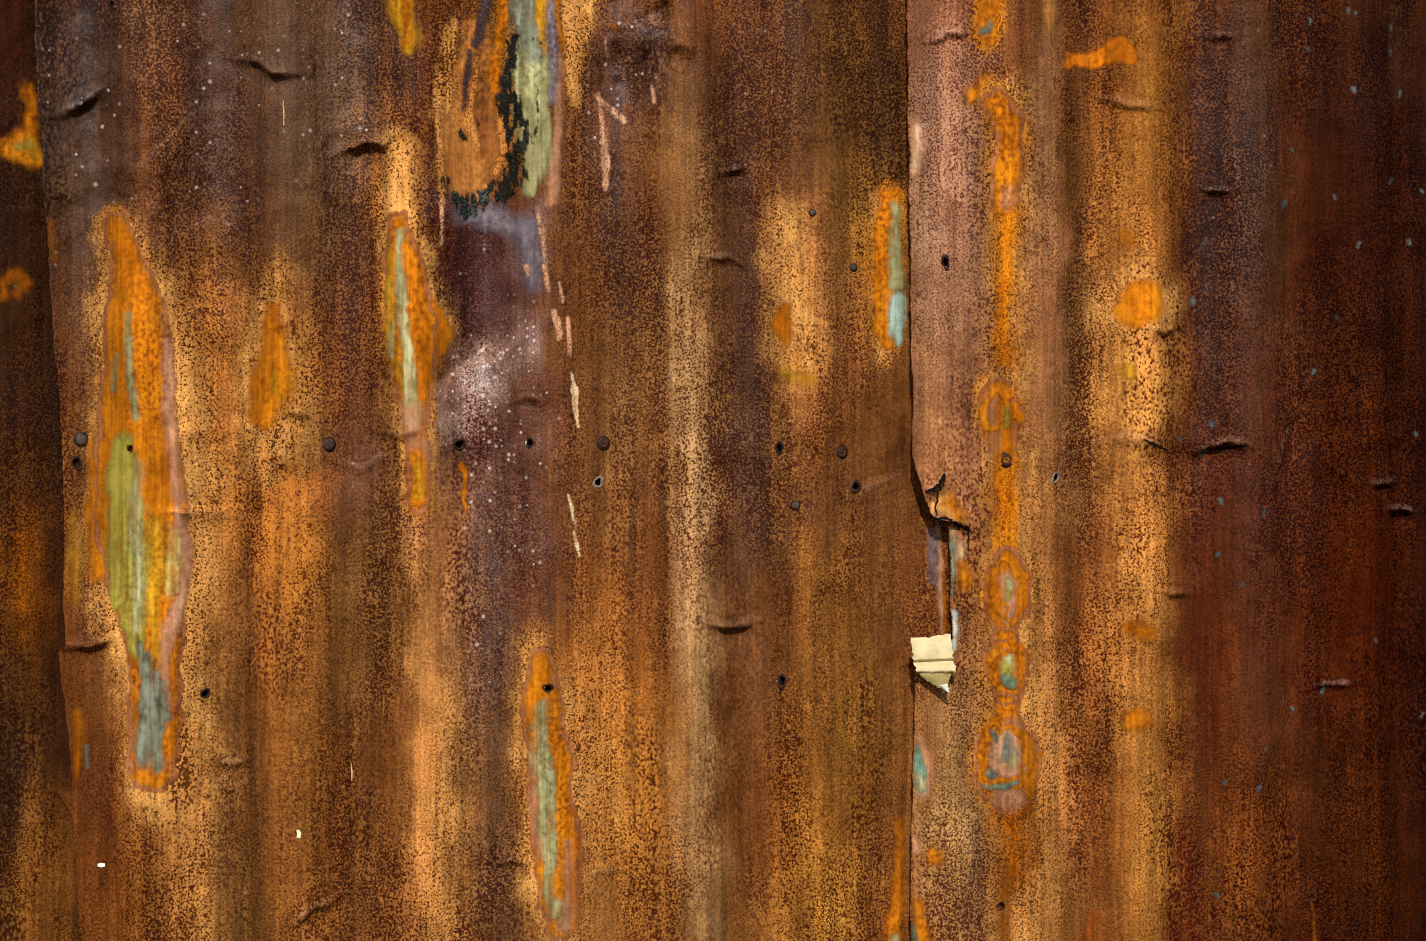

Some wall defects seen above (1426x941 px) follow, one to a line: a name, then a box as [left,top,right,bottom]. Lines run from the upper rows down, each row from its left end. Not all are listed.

rust [971,0,1007,55]
rust [1042,0,1056,34]
rust [1064,37,1137,69]
rust [911,123,925,175]
rust [235,258,322,489]
rust [373,126,457,518]
rust [864,180,907,368]
rust [73,205,228,829]
rust [930,75,1057,941]
rust [506,627,597,941]
rust [885,819,942,941]